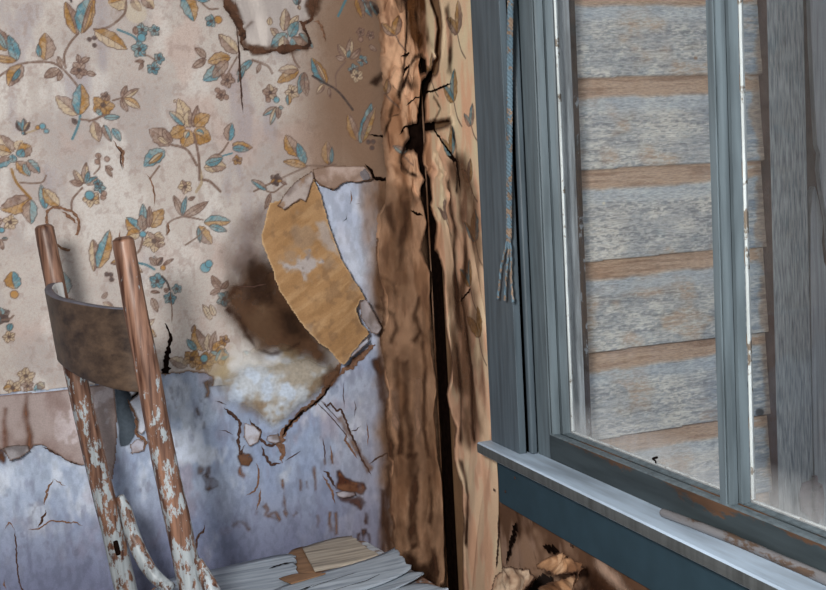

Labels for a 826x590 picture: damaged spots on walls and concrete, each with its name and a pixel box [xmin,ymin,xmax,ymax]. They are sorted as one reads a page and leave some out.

peeling [223,0,326,55]
peeling [313,165,372,190]
crack [365,164,386,181]
crack [161,292,173,374]
leakage [225,252,328,365]
crack [371,26,470,590]
peeling [0,389,84,466]
peeling [90,385,148,479]
spalling [238,453,253,477]
crack [317,387,369,463]
spalling [323,470,366,510]
crack [3,480,82,590]